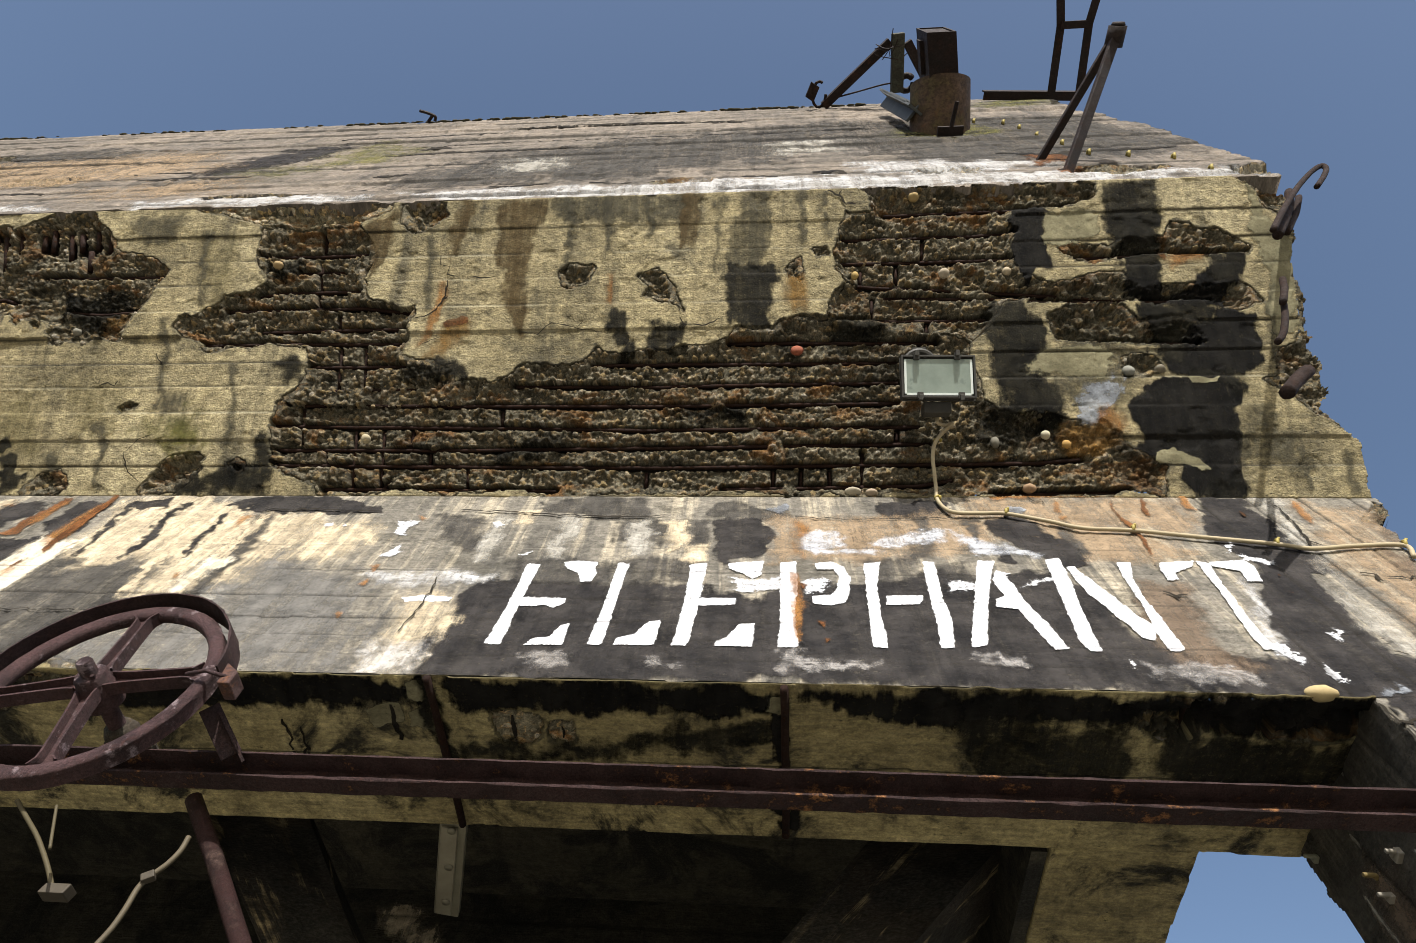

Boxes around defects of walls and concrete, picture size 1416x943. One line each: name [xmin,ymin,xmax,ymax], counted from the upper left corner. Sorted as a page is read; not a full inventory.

spalling [0,213,170,346]
damp [0,99,1305,358]
spalling [174,164,1251,498]
spalling [1218,274,1341,426]
spalling [1232,162,1329,244]
rust [0,498,73,535]
rust [42,495,119,552]
spalling [137,453,205,496]
damp [0,424,460,731]
damp [438,301,1416,655]
damp [441,676,781,721]
damp [798,684,1411,786]